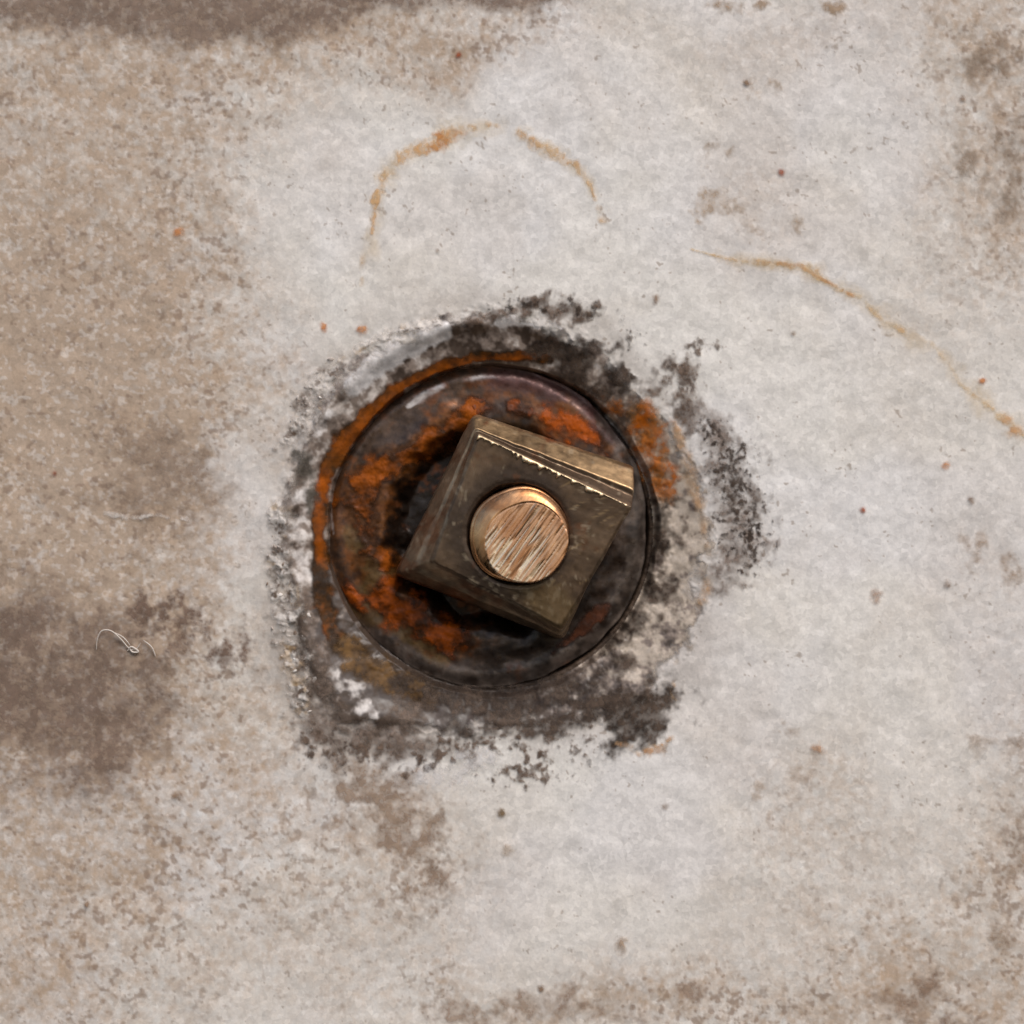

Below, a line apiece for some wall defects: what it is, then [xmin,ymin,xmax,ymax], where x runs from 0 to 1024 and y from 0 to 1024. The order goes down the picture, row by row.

rust [371,172,388,234]
rust [397,131,449,162]
rust [529,137,594,196]
damp [467,290,631,400]
damp [292,450,320,513]
rust [311,350,611,707]
rust [604,400,684,500]
damp [647,339,769,592]
damp [299,498,684,788]